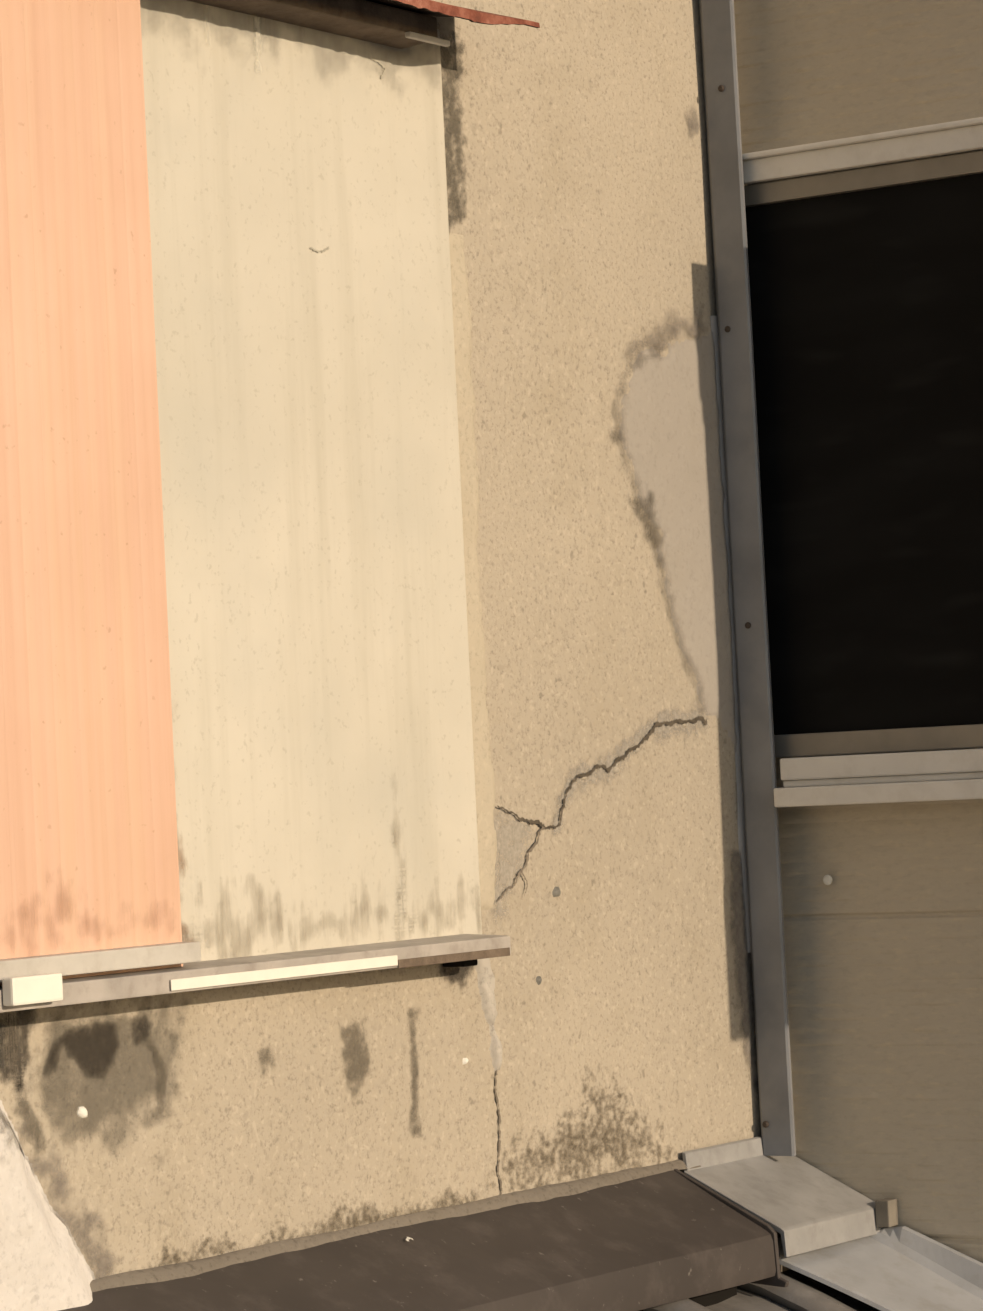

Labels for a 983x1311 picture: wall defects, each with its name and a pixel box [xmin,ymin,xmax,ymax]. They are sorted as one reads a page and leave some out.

crack [494,711,707,912]
water stain [0,1009,41,1148]
water stain [45,1024,118,1075]
water stain [133,1019,166,1097]
water stain [343,1028,369,1081]
water stain [410,1013,419,1134]
crack [494,1069,502,1195]